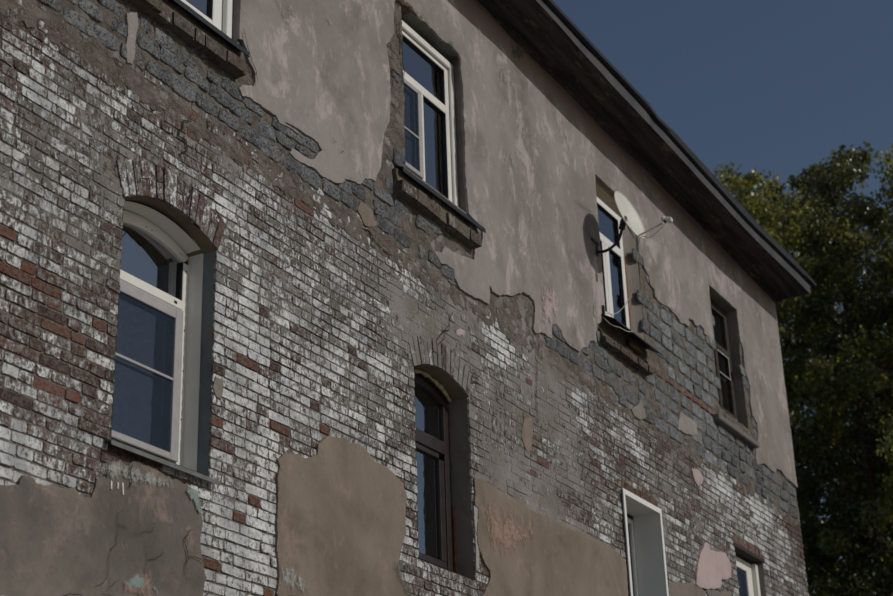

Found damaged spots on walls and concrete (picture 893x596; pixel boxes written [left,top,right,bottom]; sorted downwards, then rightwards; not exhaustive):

spalling [0,0,800,527]
peeling [694,542,731,596]